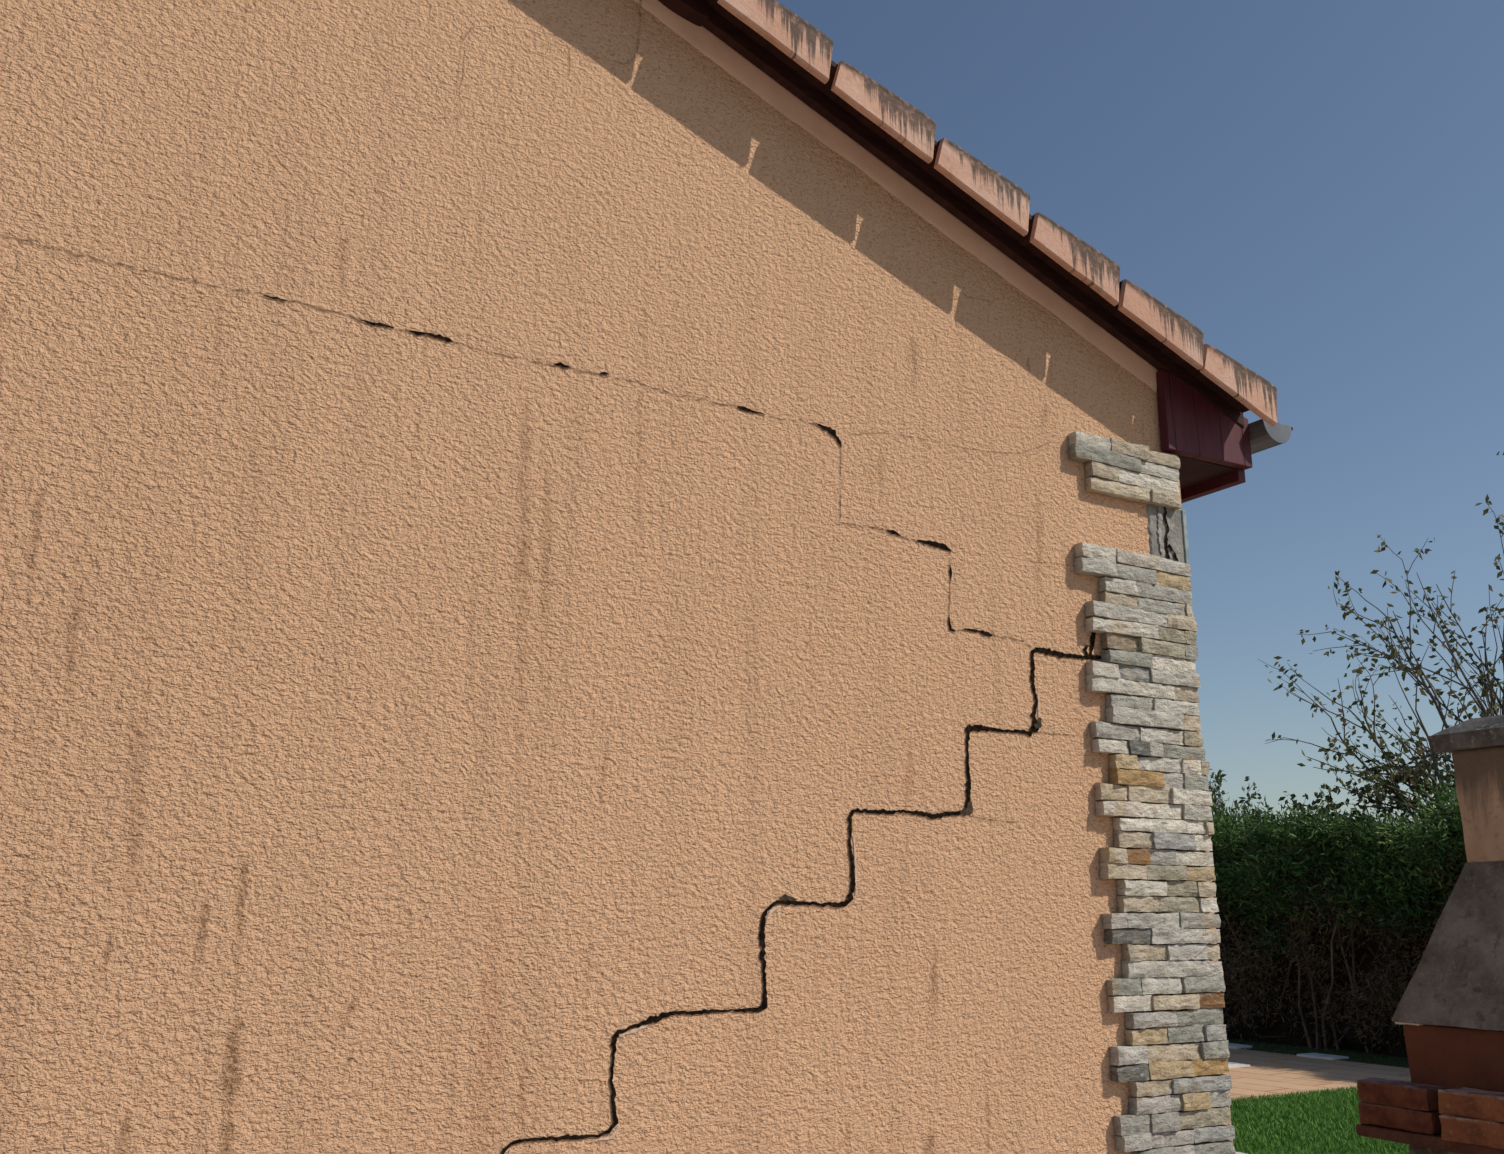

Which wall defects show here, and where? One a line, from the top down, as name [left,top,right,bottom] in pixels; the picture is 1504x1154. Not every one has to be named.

crack [2,235,1101,1154]